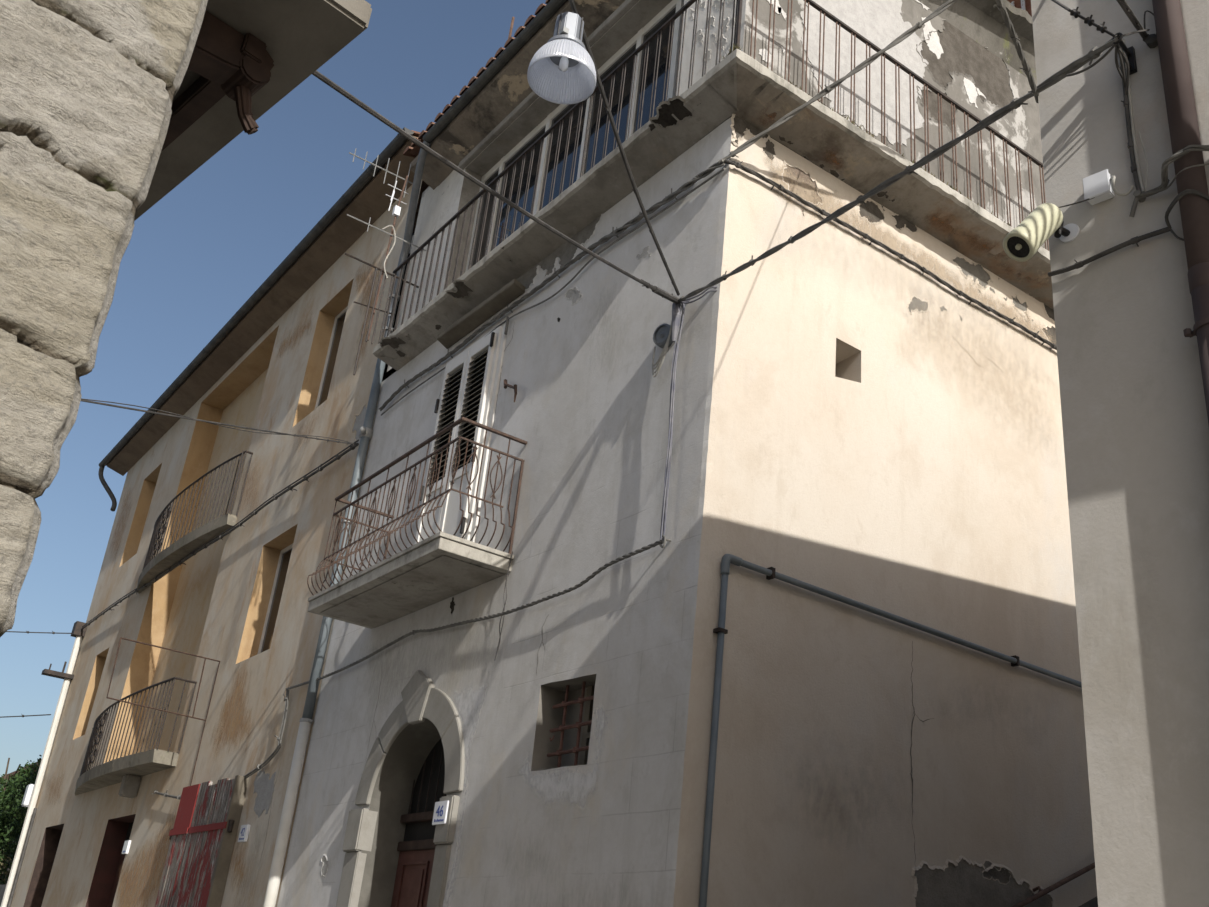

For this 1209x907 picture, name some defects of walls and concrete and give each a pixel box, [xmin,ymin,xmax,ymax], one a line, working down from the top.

flaking render [767,0,787,20]
flaking render [759,46,786,63]
spalling [648,96,701,131]
flaking render [857,190,918,235]
flaking render [906,295,963,322]
flaking render [950,255,1056,349]
crack [910,641,934,866]
spalling [911,855,1054,907]